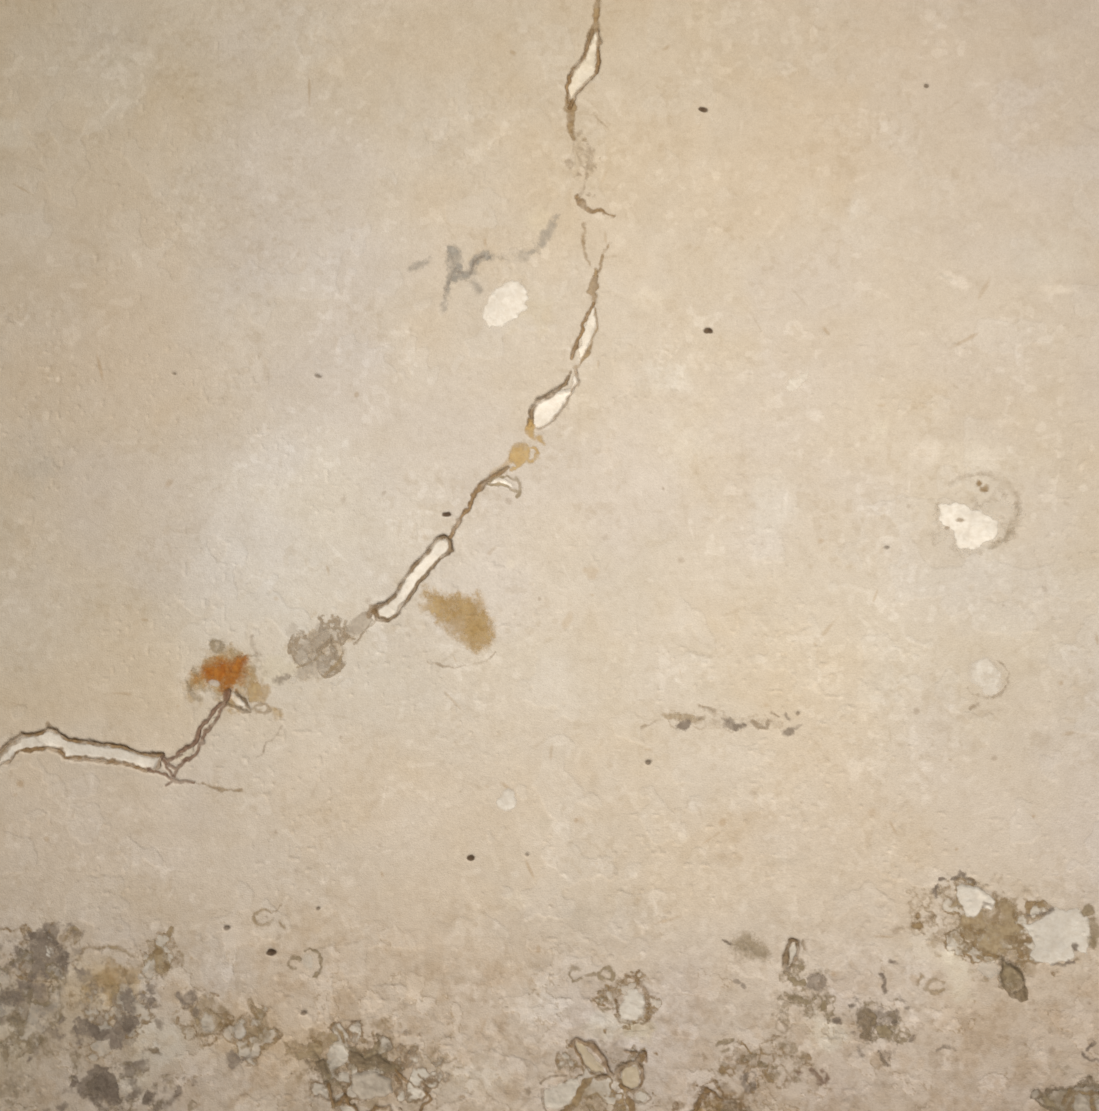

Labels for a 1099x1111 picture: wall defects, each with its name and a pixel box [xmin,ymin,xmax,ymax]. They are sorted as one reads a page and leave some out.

crack [565,7,601,140]
crack [575,195,614,216]
crack [371,240,603,622]
spalling [938,502,998,550]
corrosion [190,640,263,701]
crack [0,689,248,785]
spalling [933,871,1098,1002]
leakage [0,923,182,1061]
spalling [569,966,658,1029]
leakage [91,1048,159,1110]
spalling [285,1021,447,1111]
spalling [540,1040,657,1111]